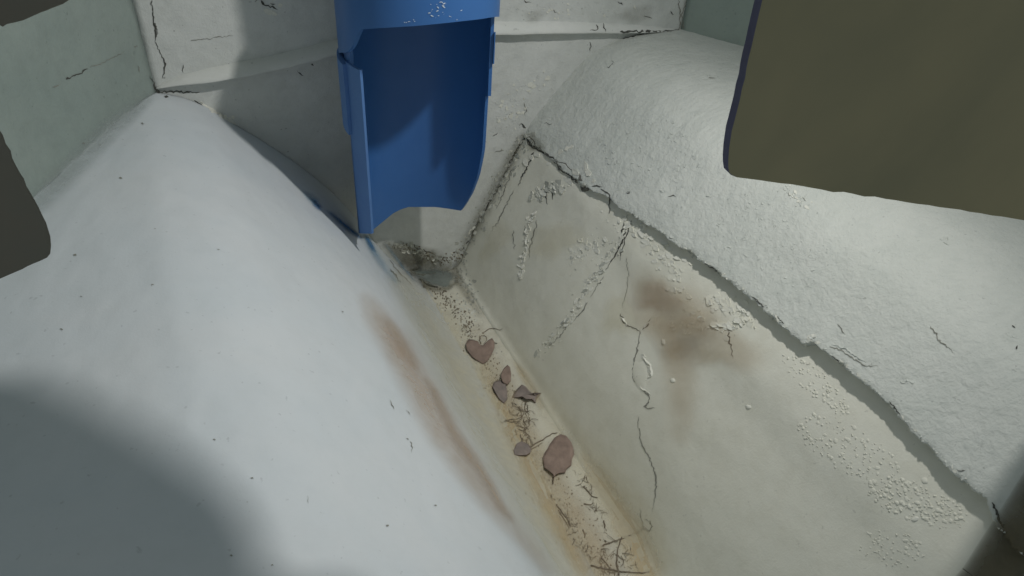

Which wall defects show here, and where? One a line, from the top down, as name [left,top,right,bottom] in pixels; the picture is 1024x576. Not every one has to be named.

crack [54,1,237,125]
peeling [388,122,550,315]
peeling [512,180,570,279]
crack [523,137,631,213]
crack [620,258,657,537]